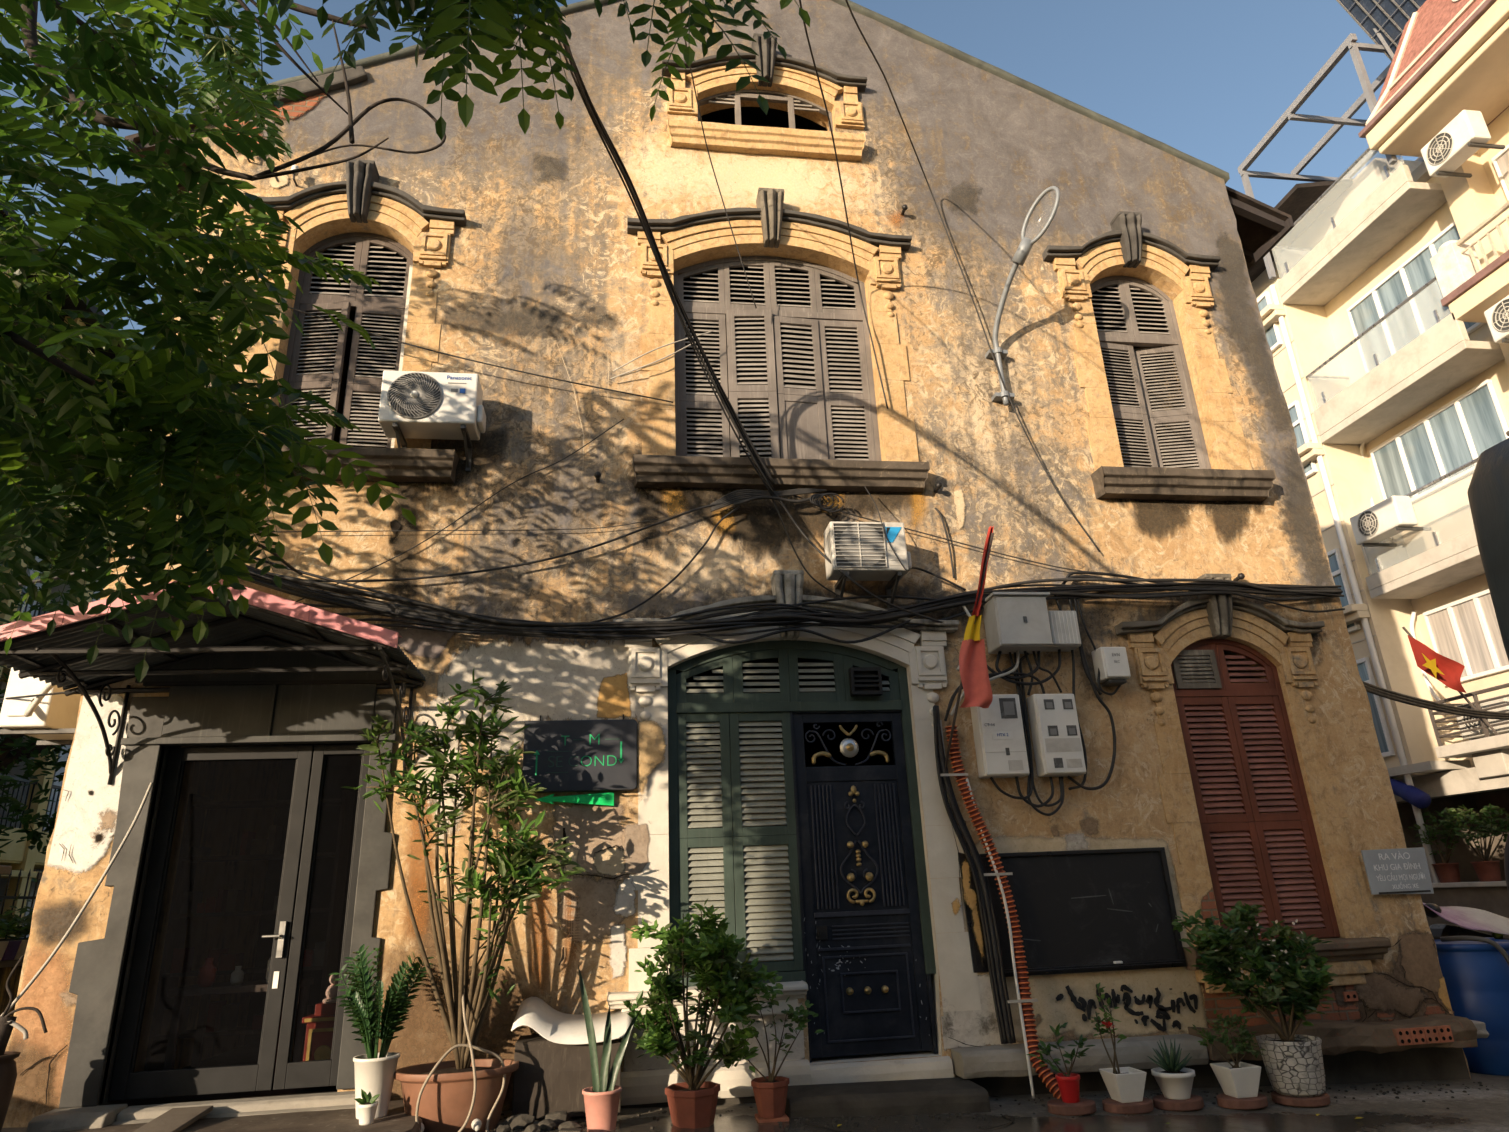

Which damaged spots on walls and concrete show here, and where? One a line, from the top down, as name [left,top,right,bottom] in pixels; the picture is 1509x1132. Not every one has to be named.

water stain [638,487,914,560]
peeling [47,693,130,872]
peeling [412,636,666,980]
peeling [940,817,1454,1051]